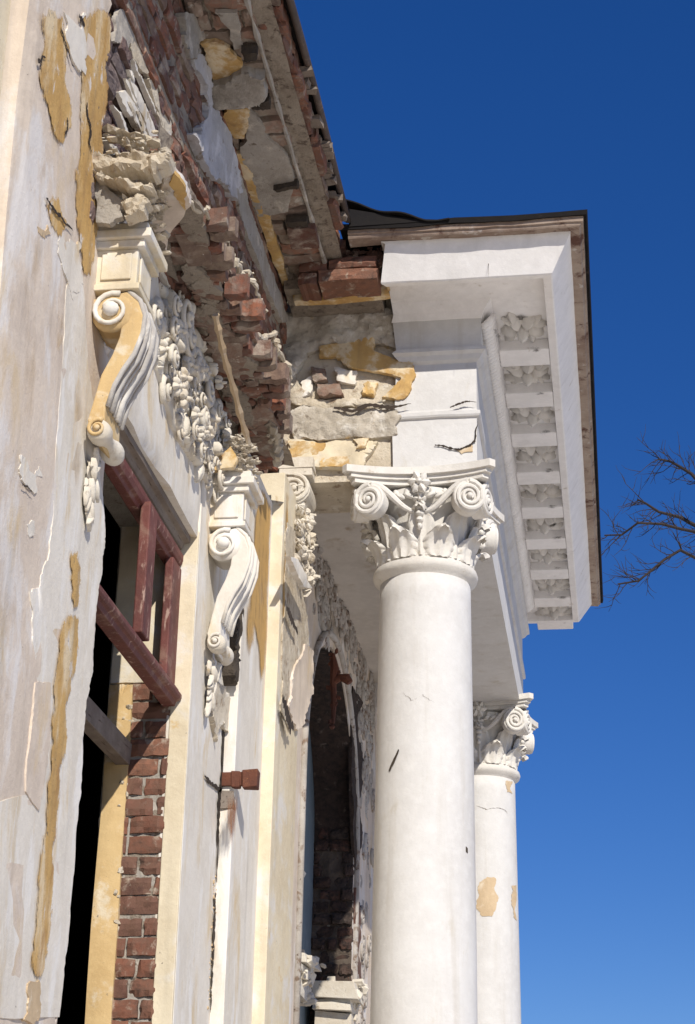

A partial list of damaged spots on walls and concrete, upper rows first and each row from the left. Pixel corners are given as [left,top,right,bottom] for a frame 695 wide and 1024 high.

crack [435,401,478,454]
peeling [0,0,416,1024]
peeling [476,877,517,920]